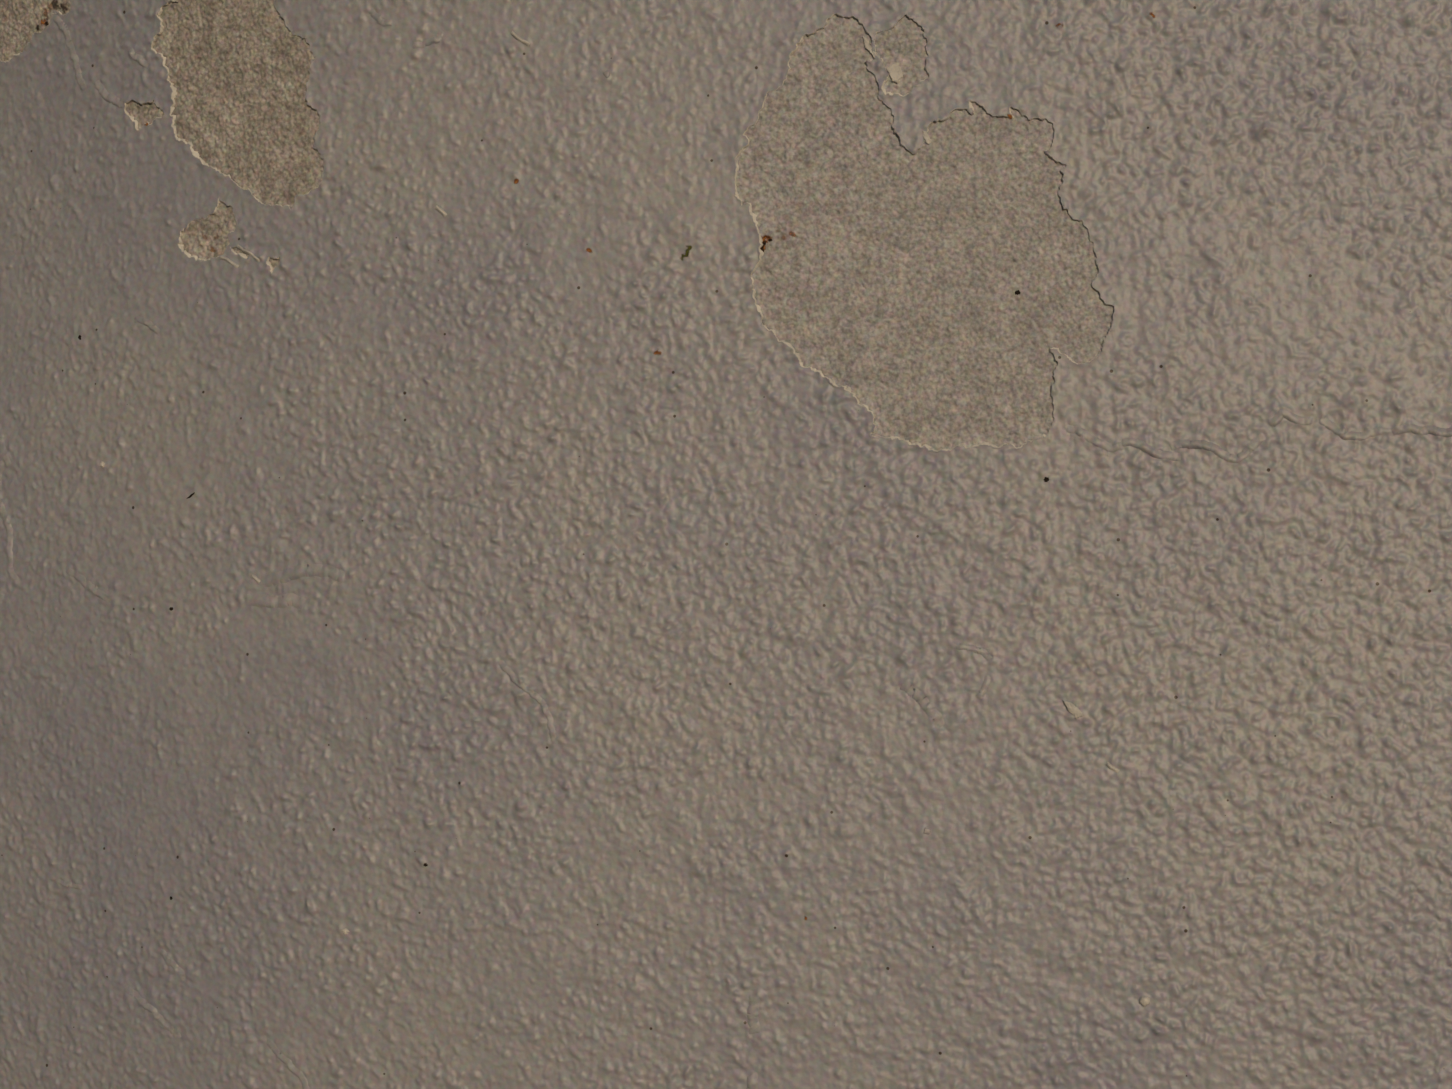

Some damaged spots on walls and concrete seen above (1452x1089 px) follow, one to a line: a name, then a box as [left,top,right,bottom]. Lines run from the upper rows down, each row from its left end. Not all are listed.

peeling [0,0,72,63]
peeling [124,0,325,212]
peeling [177,197,281,276]
peeling [733,13,1115,454]